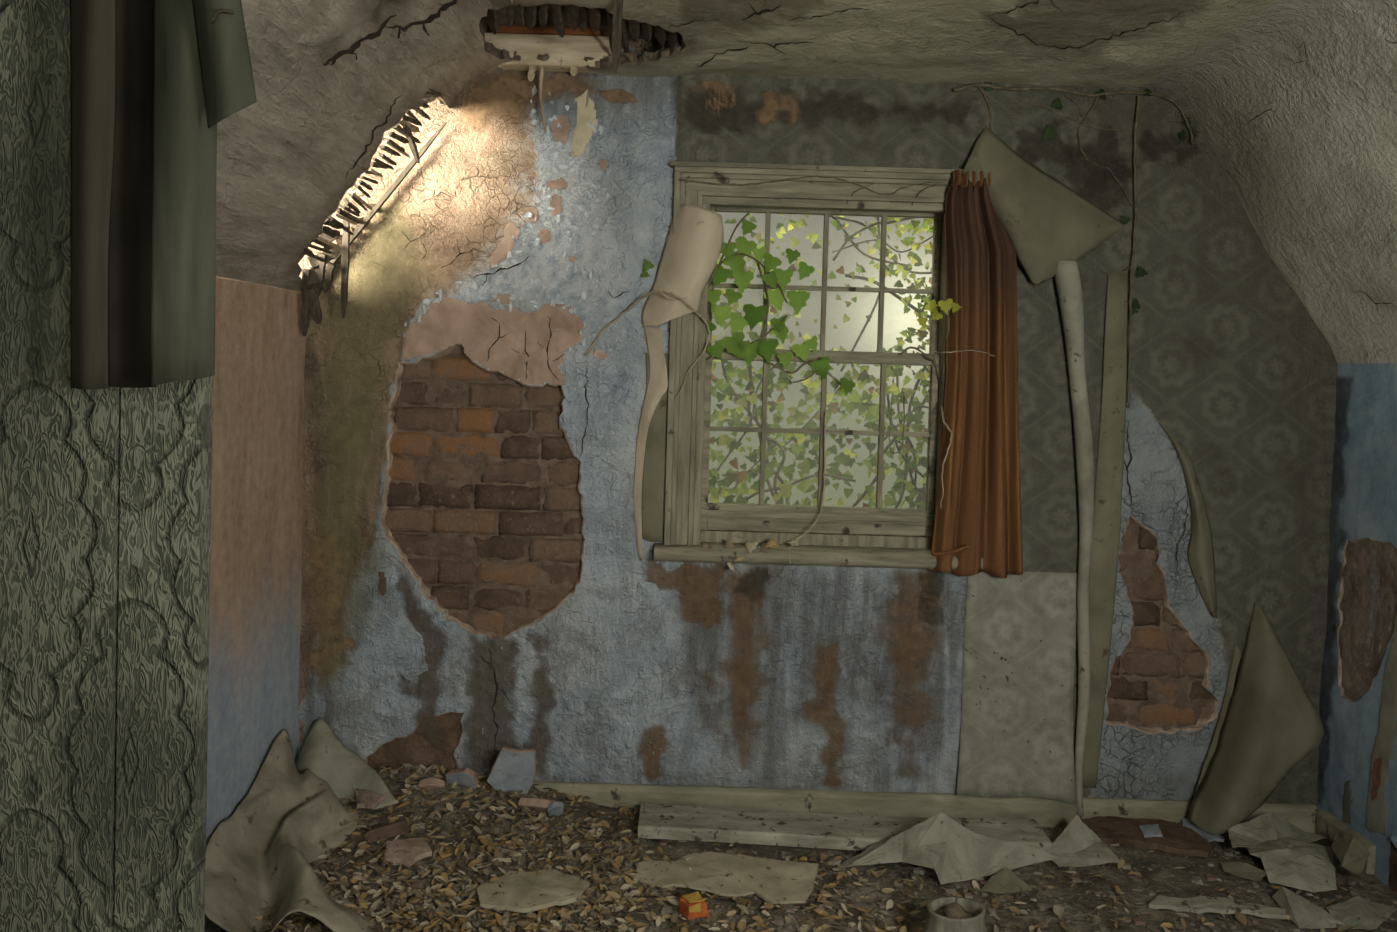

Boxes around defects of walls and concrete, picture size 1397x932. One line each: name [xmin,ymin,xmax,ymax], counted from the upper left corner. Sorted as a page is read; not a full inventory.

crack [323,0,457,66]
spalling [381,85,637,639]
peeling [378,572,386,596]
corrosion [641,726,666,779]
corrosion [647,560,764,764]
corrosion [804,644,846,788]
spalling [1054,260,1241,817]
spalling [1335,537,1397,893]